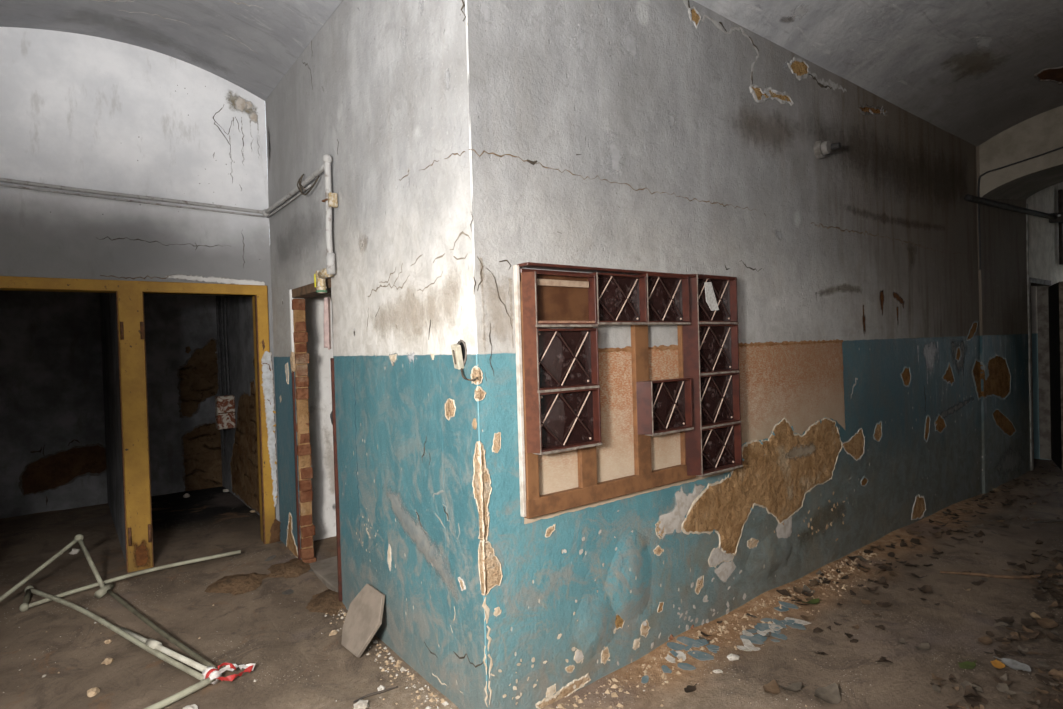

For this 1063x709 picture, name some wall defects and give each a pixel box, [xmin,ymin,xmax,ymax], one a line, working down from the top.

flaking render [749,84,794,106]
flaking render [787,56,847,93]
crack [213,105,260,190]
crack [401,149,766,216]
crack [97,231,245,267]
crack [367,213,512,377]
peeling [445,398,456,420]
flaking render [972,354,1016,437]
flaking render [18,443,107,496]
flaking render [472,418,591,709]
flaking render [613,417,882,673]
peeling [601,646,619,666]